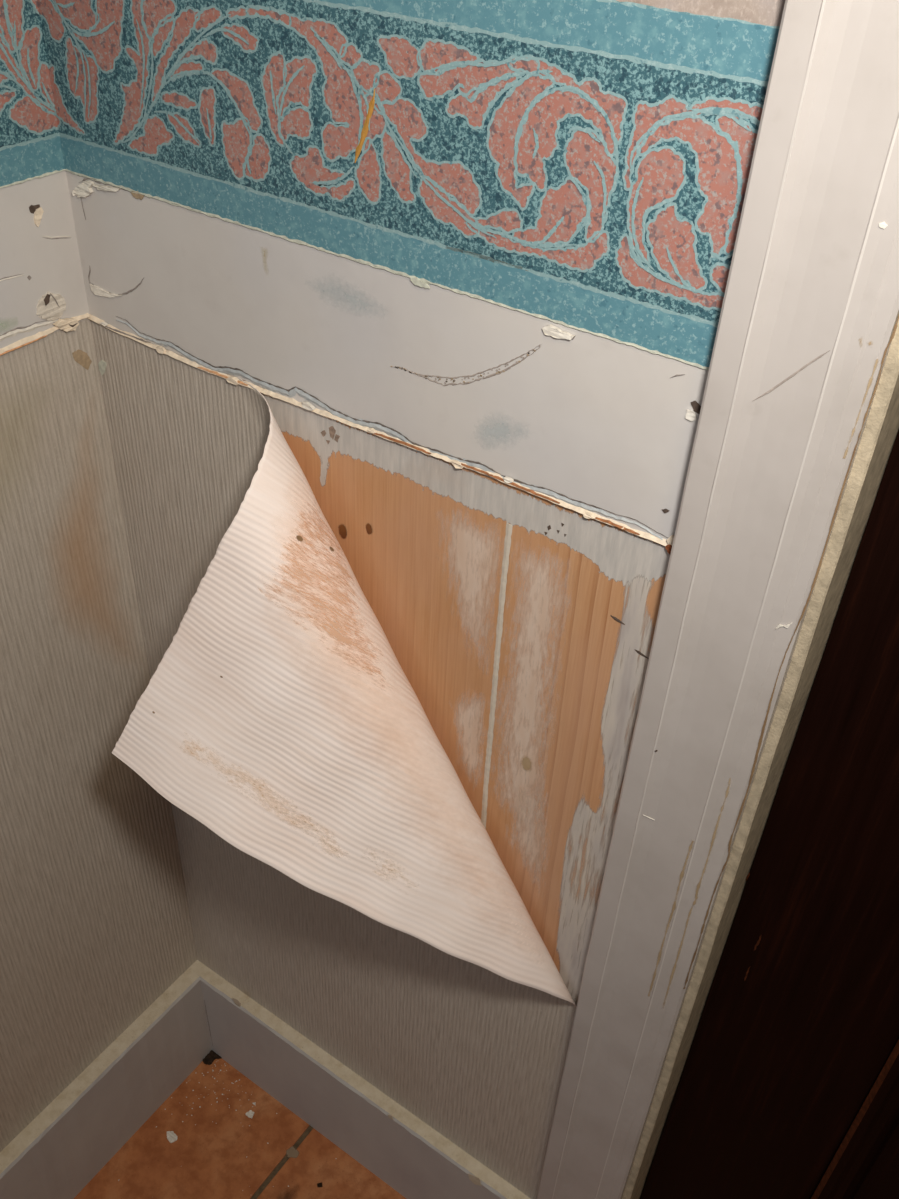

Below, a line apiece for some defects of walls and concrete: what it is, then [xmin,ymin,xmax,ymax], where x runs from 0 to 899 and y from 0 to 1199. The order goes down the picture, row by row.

peeling [29,204,44,227]
flaking render [36,291,66,321]
crack [0,266,668,546]
peeling [112,378,670,1013]